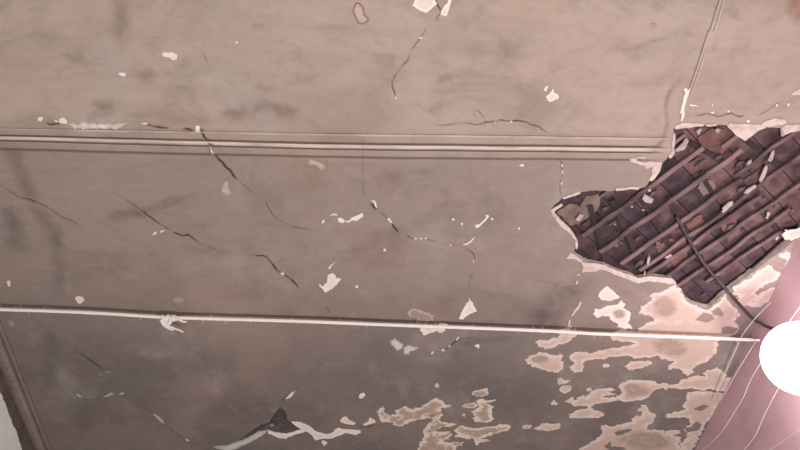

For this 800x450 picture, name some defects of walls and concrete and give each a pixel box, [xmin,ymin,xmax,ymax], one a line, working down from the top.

peeling [412,0,451,16]
crack [112,192,201,245]
crack [369,200,427,240]
crack [253,255,299,290]
peeling [319,261,341,293]
spalling [522,86,800,450]
peeling [459,299,477,319]
peeling [213,388,511,450]